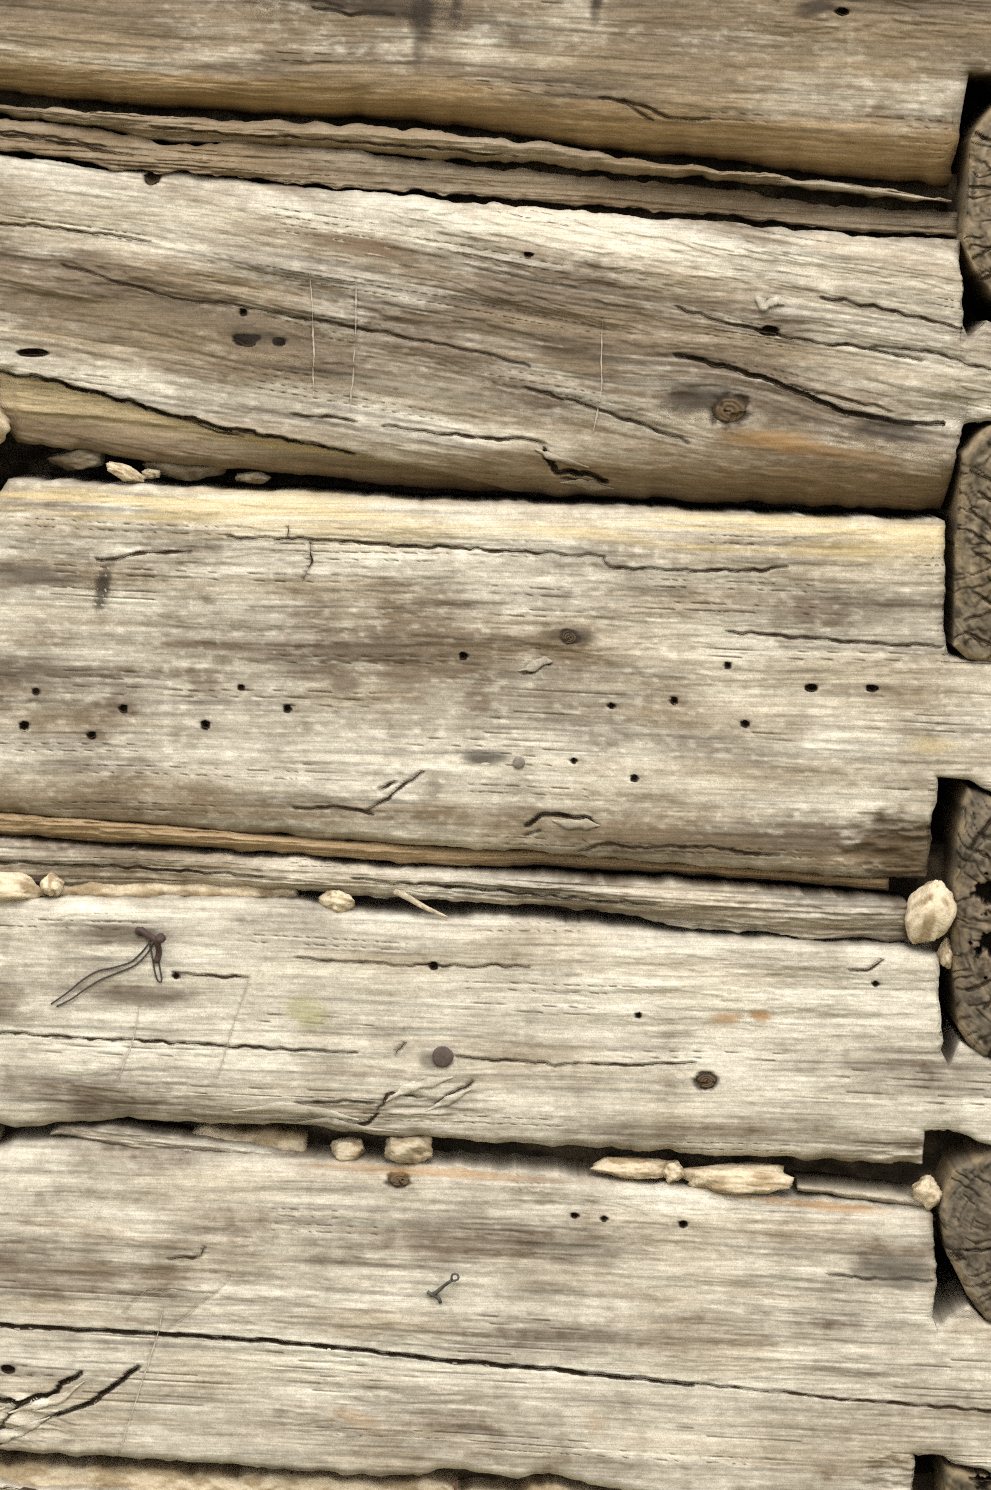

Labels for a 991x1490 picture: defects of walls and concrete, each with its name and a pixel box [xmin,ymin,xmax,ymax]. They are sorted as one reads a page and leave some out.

crack [679,297,991,370]
crack [0,371,607,482]
crack [676,355,945,425]
crack [295,770,425,815]
crack [299,1057,695,1126]
crack [0,1322,991,1445]